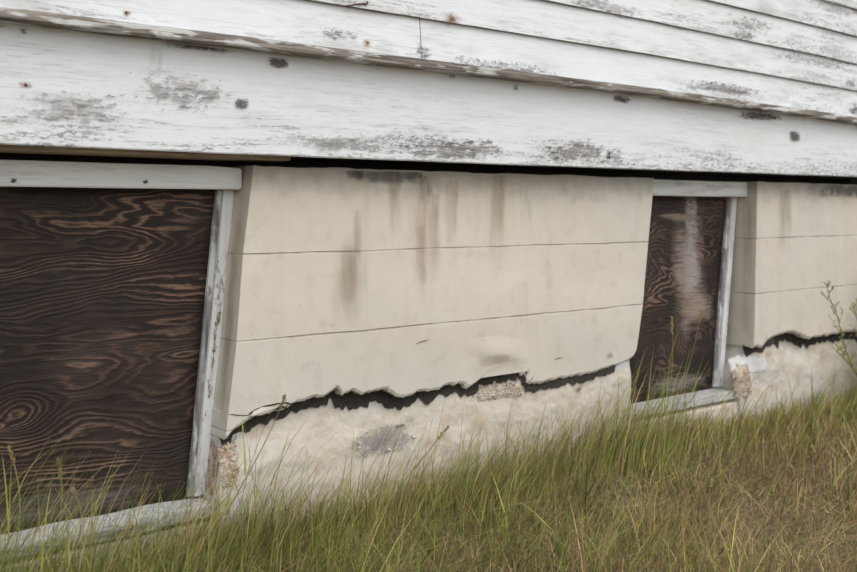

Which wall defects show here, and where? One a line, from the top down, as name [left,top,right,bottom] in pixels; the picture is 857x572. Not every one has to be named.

peeling [807,0,857,16]
peeling [21,69,248,128]
peeling [689,80,768,98]
peeling [278,129,386,151]
peeling [397,136,509,160]
peeling [535,136,623,164]
crack [743,332,857,357]
crack [220,357,616,445]
spalling [473,381,525,401]
spalling [205,436,240,496]